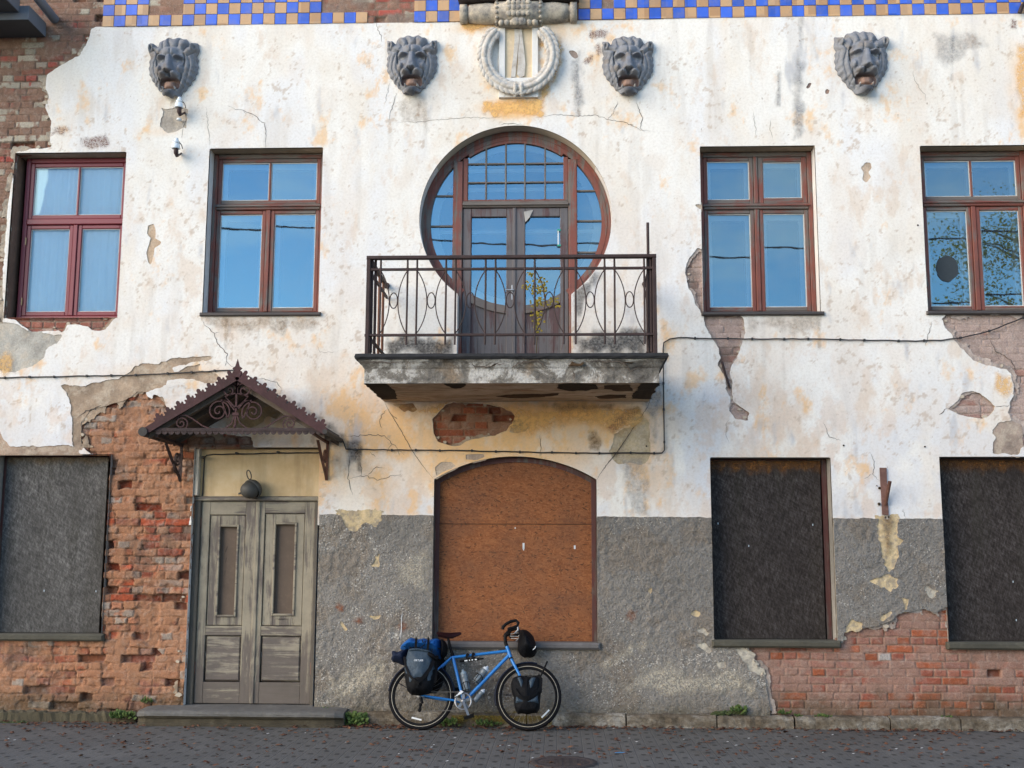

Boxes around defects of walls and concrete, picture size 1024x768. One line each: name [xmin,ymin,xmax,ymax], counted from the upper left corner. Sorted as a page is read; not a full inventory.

leakage [483,85,549,117]
flaking render [0,0,117,372]
flaking render [147,224,161,264]
flaking render [685,248,749,421]
crack [346,409,432,494]
spalling [365,384,417,412]
flaking render [433,383,661,479]
flaking render [942,315,1024,458]
flaking render [0,356,281,722]
peeling [335,509,384,532]
flaking render [735,514,1024,726]